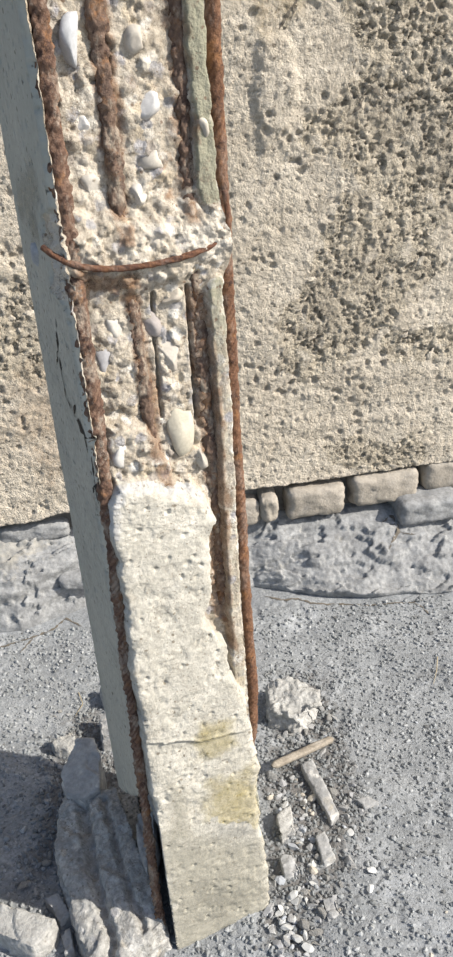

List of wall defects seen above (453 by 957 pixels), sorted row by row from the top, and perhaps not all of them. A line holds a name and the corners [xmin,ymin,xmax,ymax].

crack [55,318,101,510]
spalling [0,0,259,925]
corrosion [212,451,234,638]